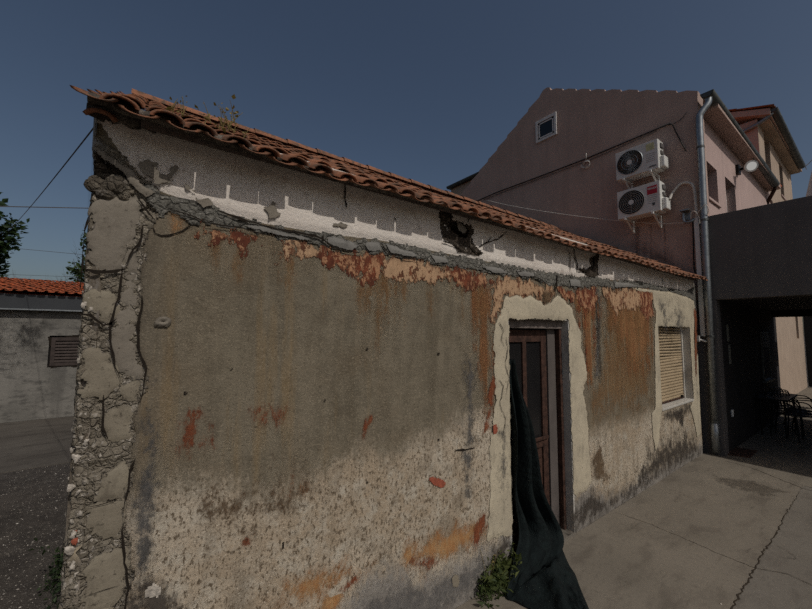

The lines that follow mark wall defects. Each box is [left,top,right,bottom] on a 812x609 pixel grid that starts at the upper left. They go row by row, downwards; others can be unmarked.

flaking render [49,135,697,609]
rust [575,288,653,385]
rust [593,449,609,483]
leakage [565,404,699,535]
rust [404,515,487,570]